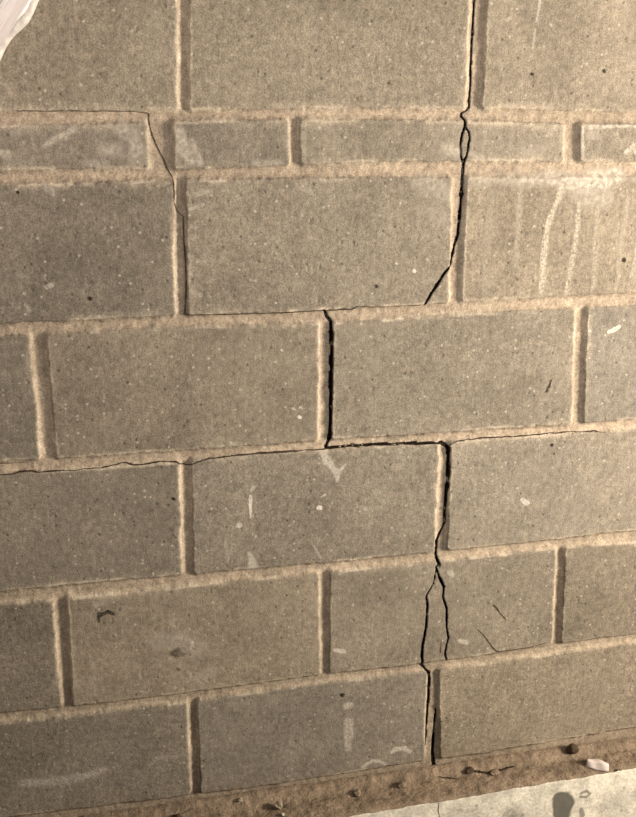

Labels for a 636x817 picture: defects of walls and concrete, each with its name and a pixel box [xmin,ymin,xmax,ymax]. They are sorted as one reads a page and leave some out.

crack [0,110,606,779]
crack [392,1,475,307]